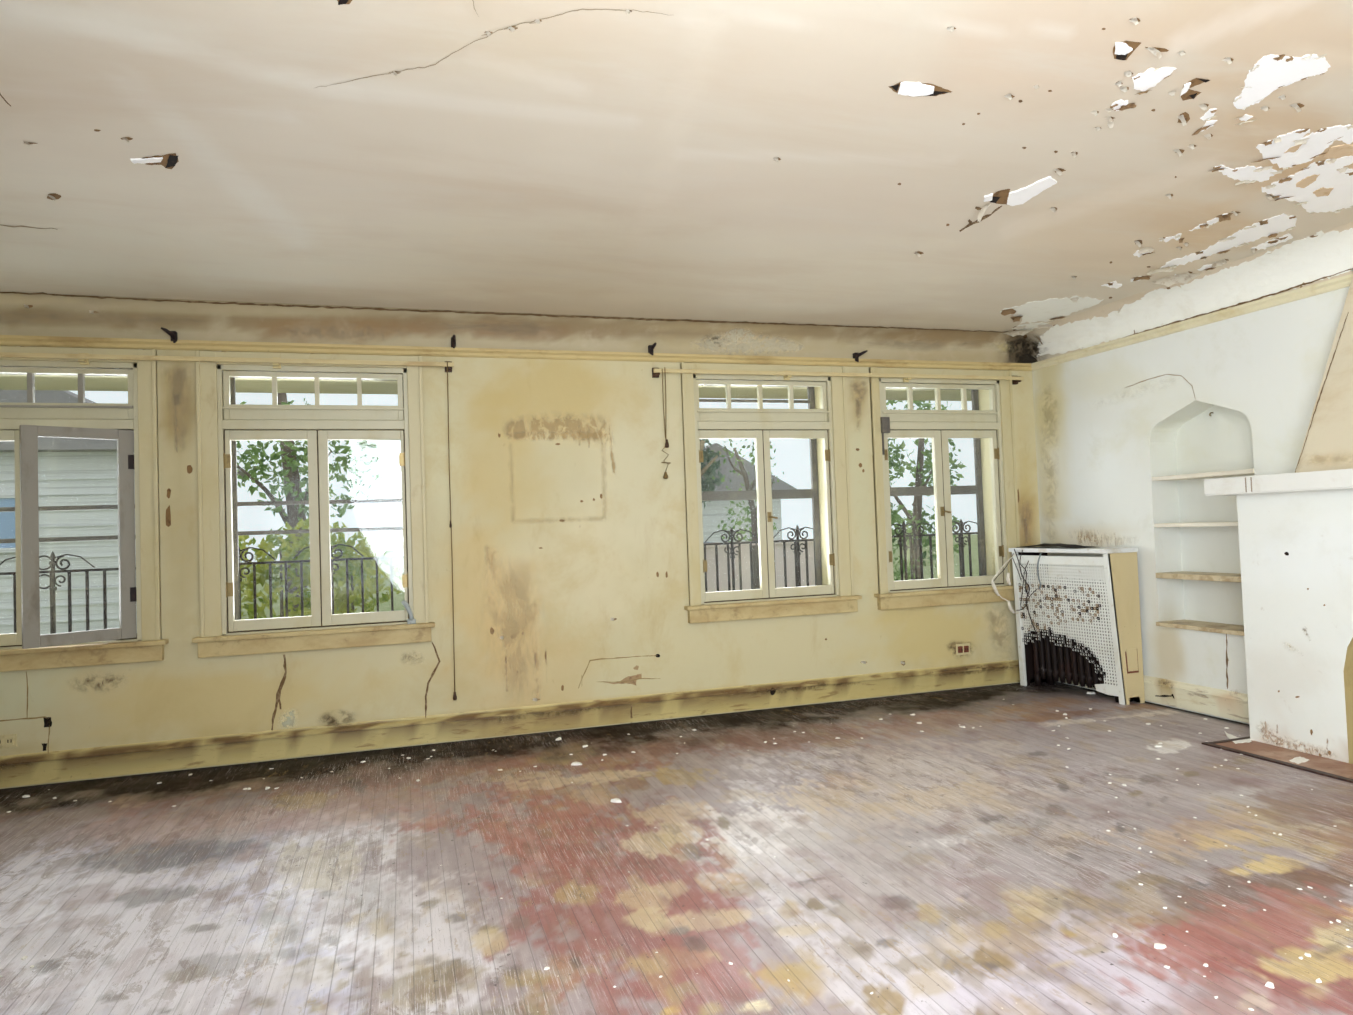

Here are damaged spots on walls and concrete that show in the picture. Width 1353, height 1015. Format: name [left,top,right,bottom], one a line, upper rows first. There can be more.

crack [315,0,667,88]
flaking render [888,82,952,97]
peeling [1090,41,1331,157]
flaking render [978,151,1078,222]
peeling [997,124,1353,363]
crack [271,654,287,730]
crack [425,642,440,718]